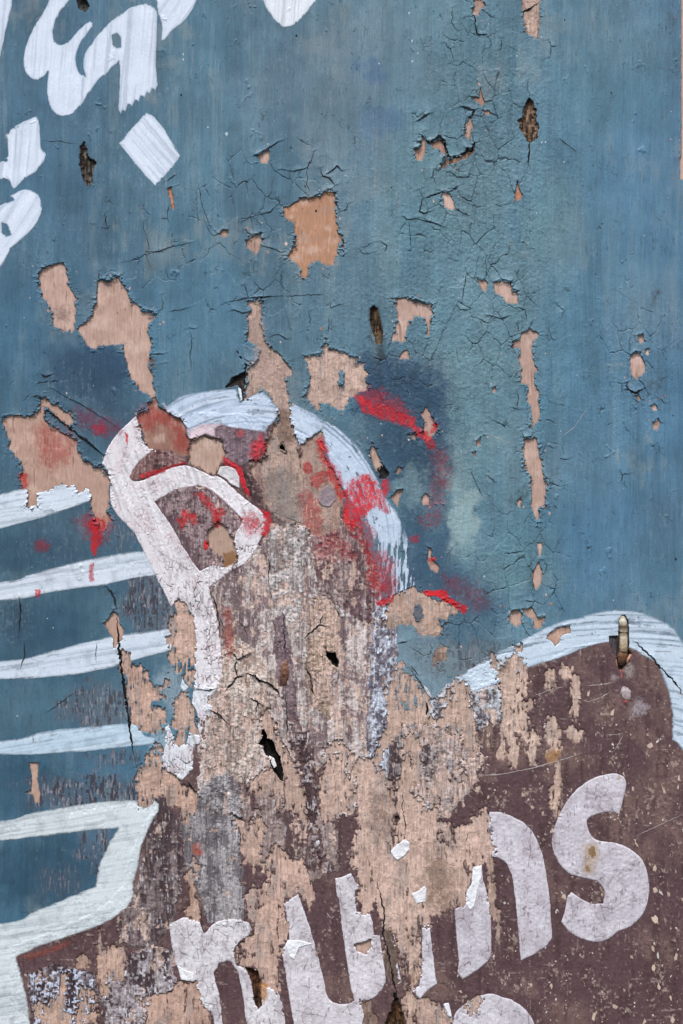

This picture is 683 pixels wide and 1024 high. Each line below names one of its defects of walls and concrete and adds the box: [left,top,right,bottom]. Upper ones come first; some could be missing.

crack [446,9,502,60]
crack [168,175,340,332]
peeling [283,189,344,281]
crack [286,152,348,210]
crack [360,106,496,254]
crack [457,257,564,339]
peeling [2,396,113,530]
crack [95,588,137,766]
peeling [24,263,584,1024]